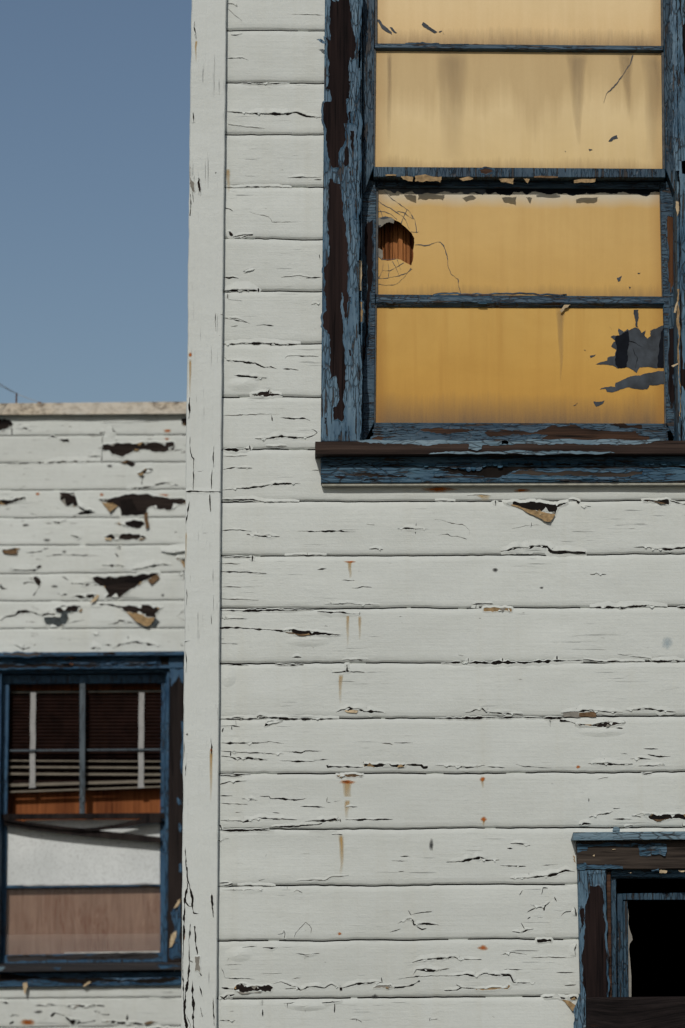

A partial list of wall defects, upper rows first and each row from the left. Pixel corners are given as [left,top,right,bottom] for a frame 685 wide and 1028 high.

peeling [317,0,406,424]
peeling [615,331,629,368]
peeling [0,418,15,435]
peeling [58,437,186,542]
peeling [502,499,569,522]
peeling [42,570,164,629]
crack [184,703,392,842]
crack [579,807,641,836]
crack [18,953,153,961]
crack [0,1001,56,1025]
peeling [50,1003,170,1028]